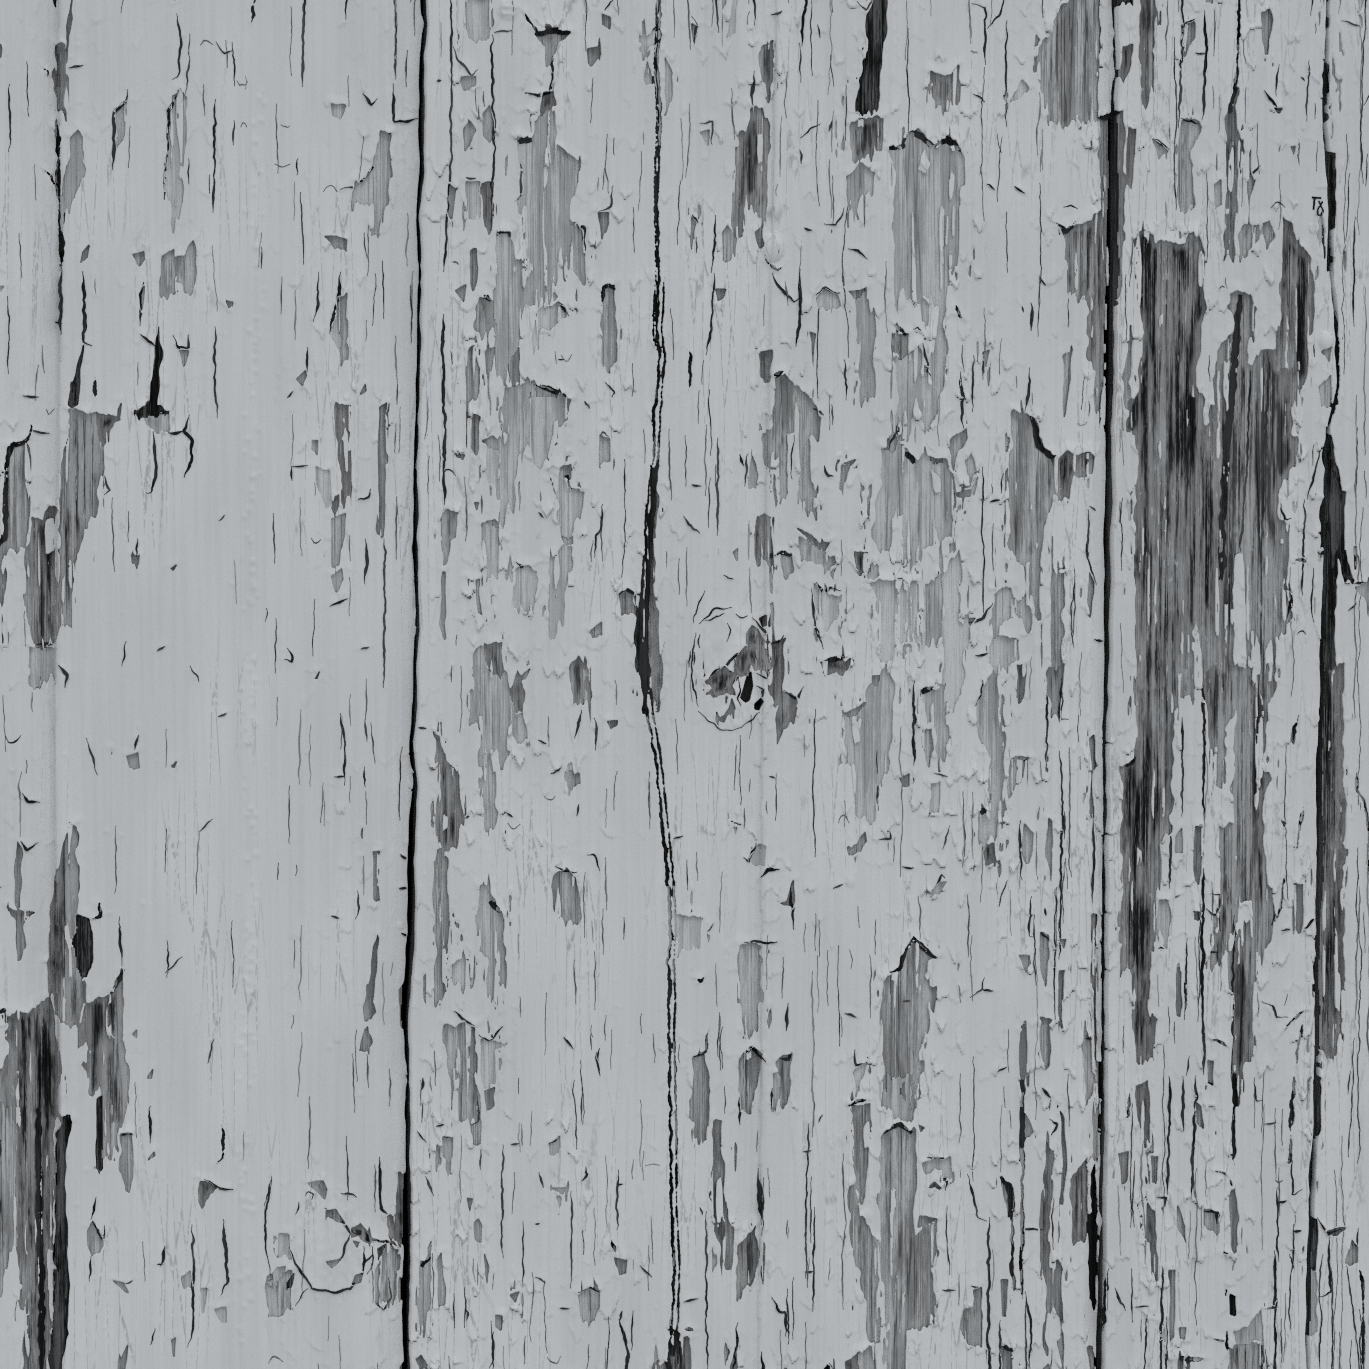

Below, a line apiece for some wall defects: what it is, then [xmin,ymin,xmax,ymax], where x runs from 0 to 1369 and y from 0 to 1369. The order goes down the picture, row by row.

crack [15,1108,46,1369]
crack [0,65,96,546]
peeling [0,327,189,690]
crack [104,245,218,572]
crack [125,1128,244,1345]
peeling [423,635,541,1175]
peeling [434,22,622,640]
crack [163,0,1124,1369]
peeling [833,933,959,1369]
peeling [733,0,1102,881]
peeling [994,0,1369,1369]
crack [1099,0,1369,1369]